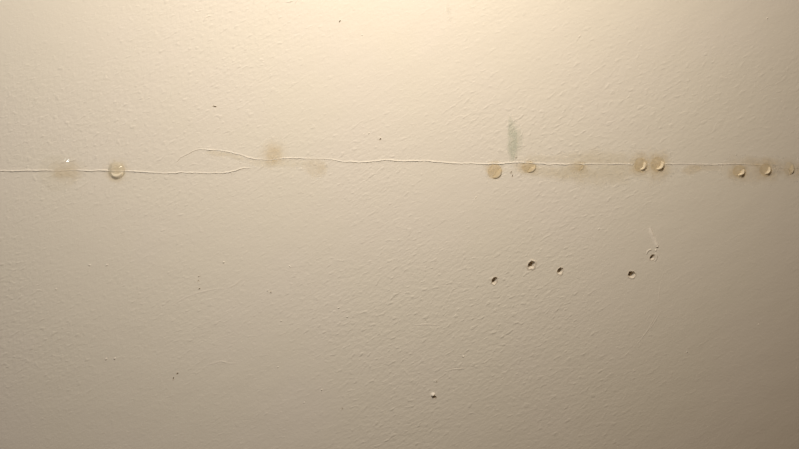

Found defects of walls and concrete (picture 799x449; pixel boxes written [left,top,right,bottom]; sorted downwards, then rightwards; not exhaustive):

crack [0,148,799,177]